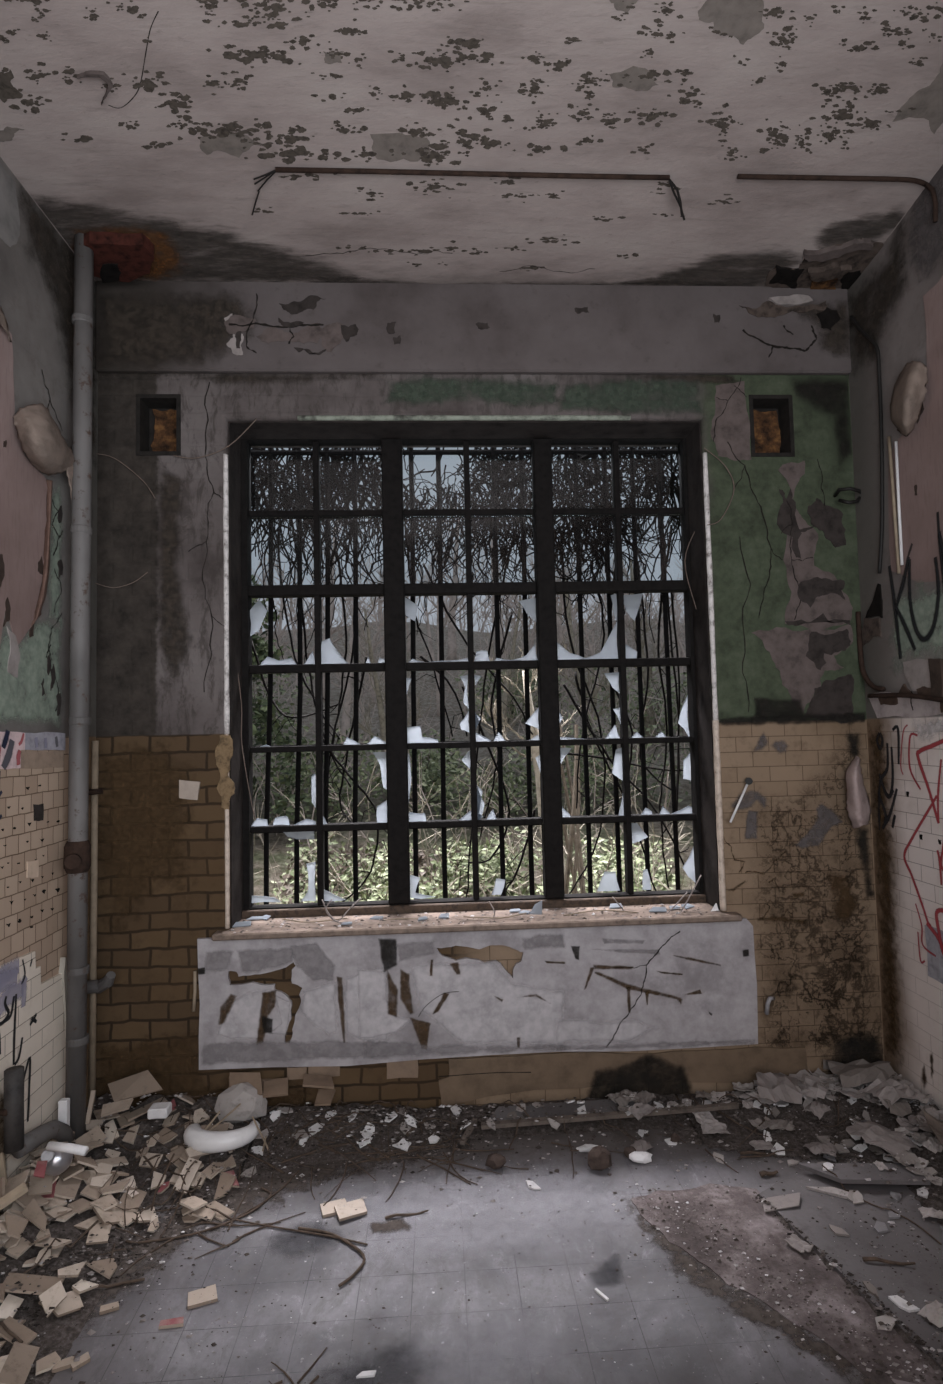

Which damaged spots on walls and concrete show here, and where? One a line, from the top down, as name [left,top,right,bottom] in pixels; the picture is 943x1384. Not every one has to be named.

peeling [0,0,943,198]
peeling [0,163,20,247]
damp [22,192,394,385]
peeling [224,295,359,355]
peeling [339,187,384,215]
peeling [336,234,580,271]
crack [742,325,817,357]
peeling [0,492,63,723]
flaking render [752,461,943,724]
peeling [0,751,64,869]
damp [720,698,900,1075]
crack [606,931,680,1048]